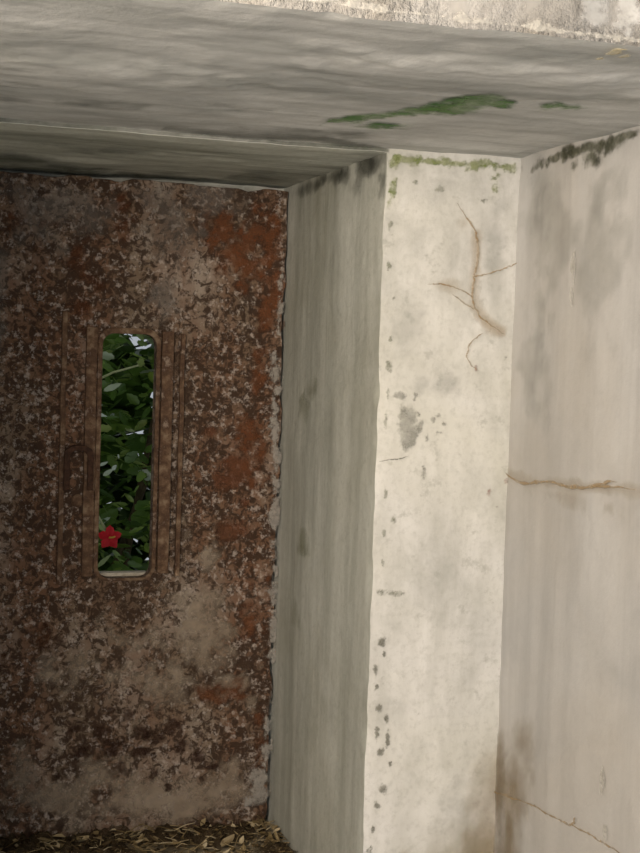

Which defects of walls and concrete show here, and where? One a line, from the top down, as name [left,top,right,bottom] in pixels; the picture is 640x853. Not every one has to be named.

crack [506,473,634,490]